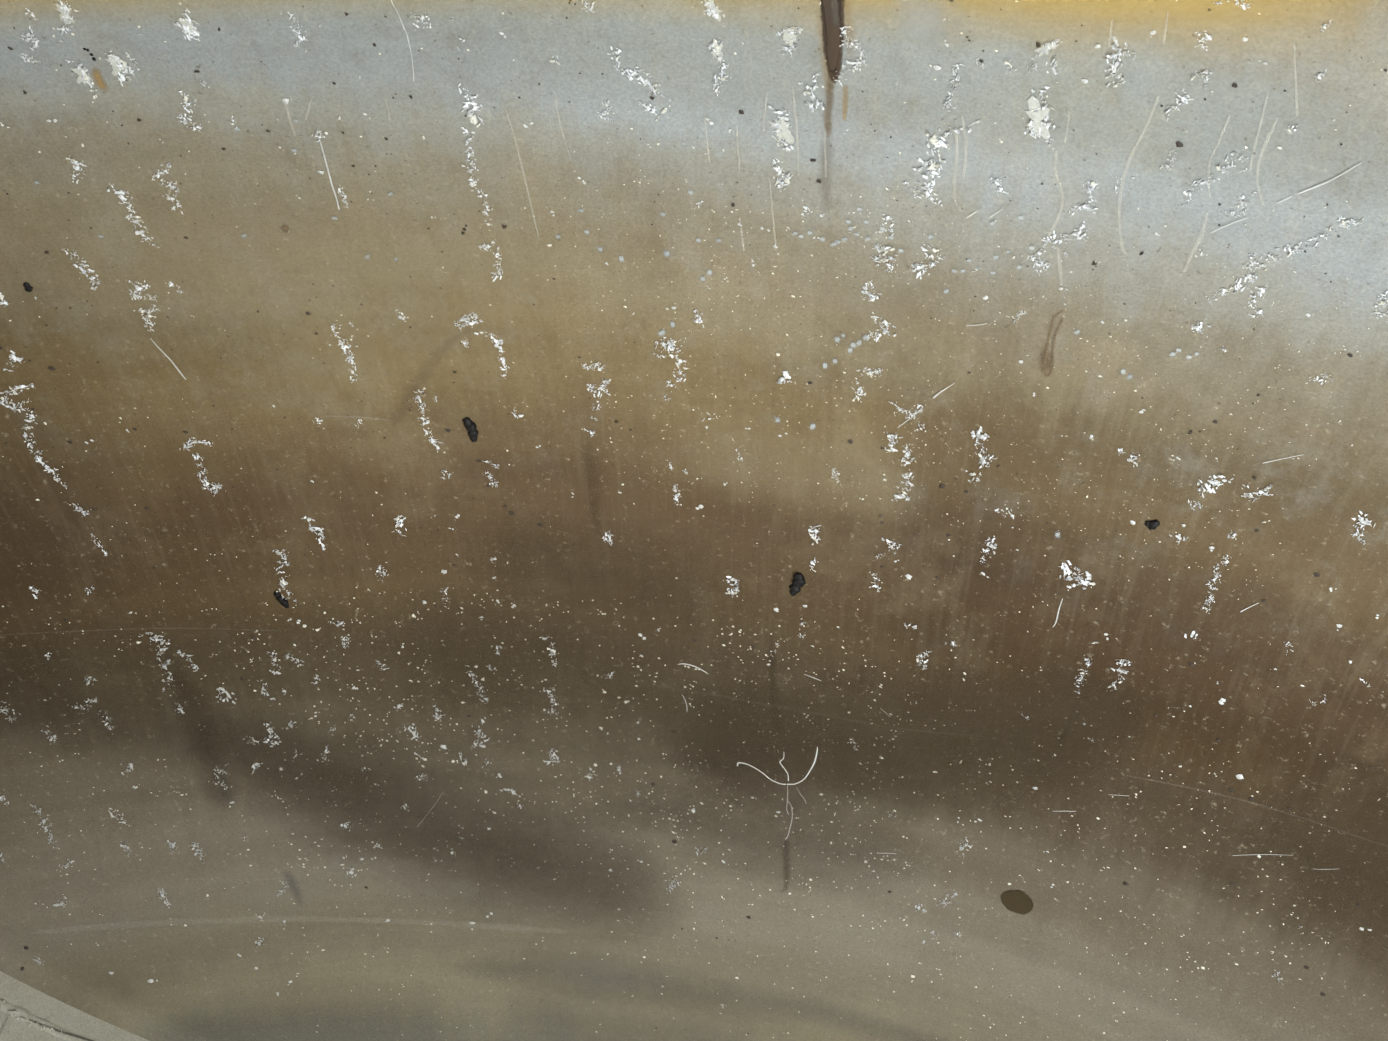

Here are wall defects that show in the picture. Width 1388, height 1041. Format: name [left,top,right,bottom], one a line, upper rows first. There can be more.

rust [820,0,844,132]
damp [319,137,340,220]
damp [793,207,903,253]
damp [823,334,869,368]
damp [713,701,1111,768]